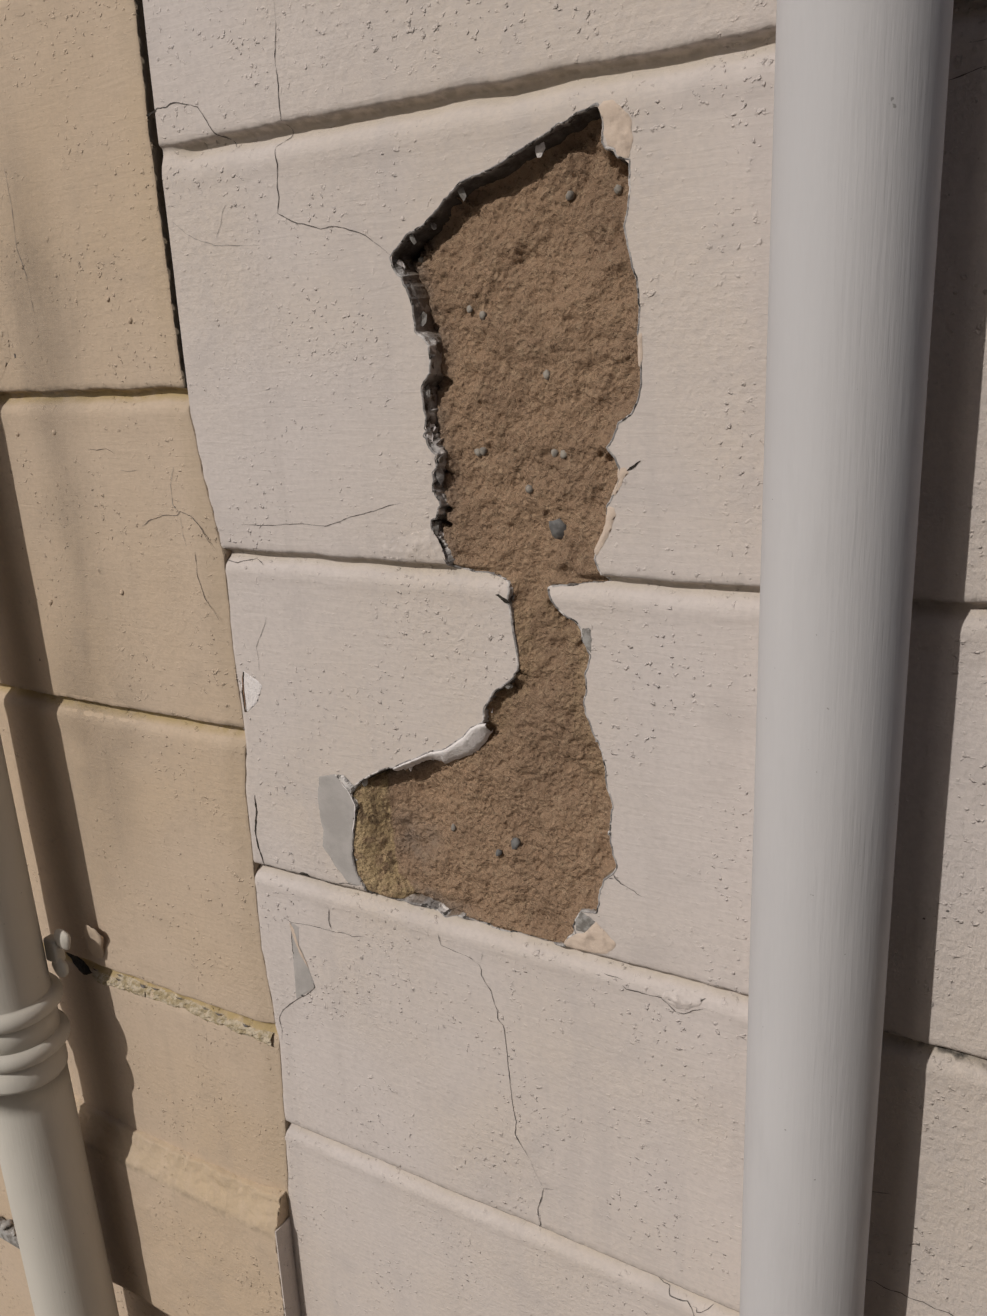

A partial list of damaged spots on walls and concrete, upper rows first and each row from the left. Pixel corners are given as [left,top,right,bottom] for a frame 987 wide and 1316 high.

crack [146,102,237,147]
crack [174,205,245,246]
crack [272,6,390,255]
flaking render [318,99,643,954]
crack [438,936,553,1227]
crack [660,1278,712,1315]